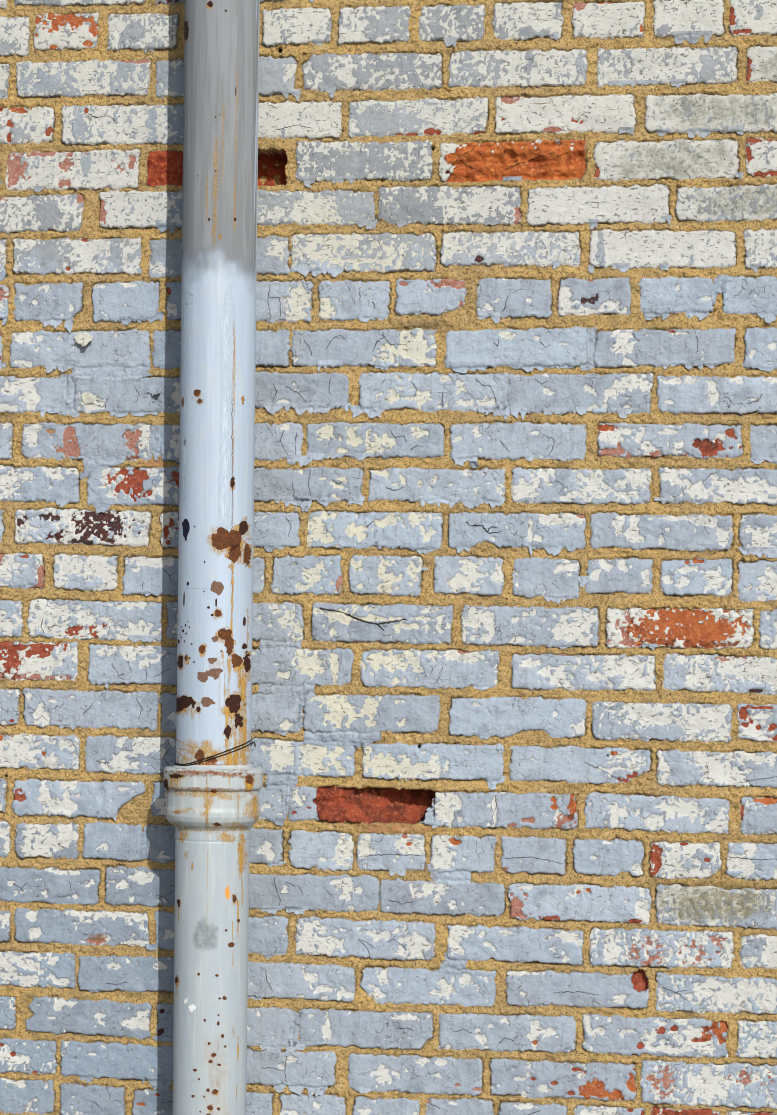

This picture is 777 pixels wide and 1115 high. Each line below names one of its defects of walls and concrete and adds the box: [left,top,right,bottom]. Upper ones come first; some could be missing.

peeling [477,298,516,340]
peeling [643,308,688,337]
peeling [0,0,202,970]
rust [230,565,249,649]
rust [166,650,258,820]
peeling [98,327,777,1115]
rust [222,823,246,888]
peeling [0,911,116,1026]
peeling [0,997,106,1112]